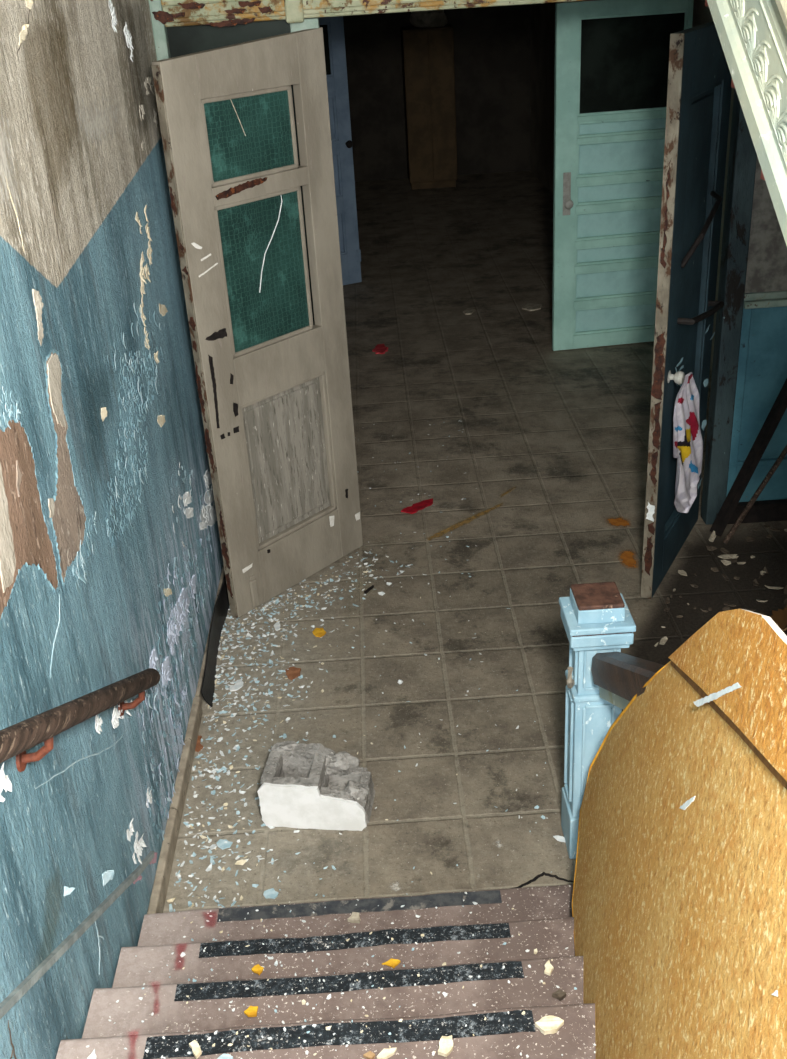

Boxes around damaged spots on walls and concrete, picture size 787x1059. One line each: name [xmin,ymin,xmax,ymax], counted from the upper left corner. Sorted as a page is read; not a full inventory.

peeling [135,205,160,364]
corrosion [660,158,672,269]
spalling [0,289,87,620]
corrosion [188,317,215,472]
corrosion [650,333,666,485]